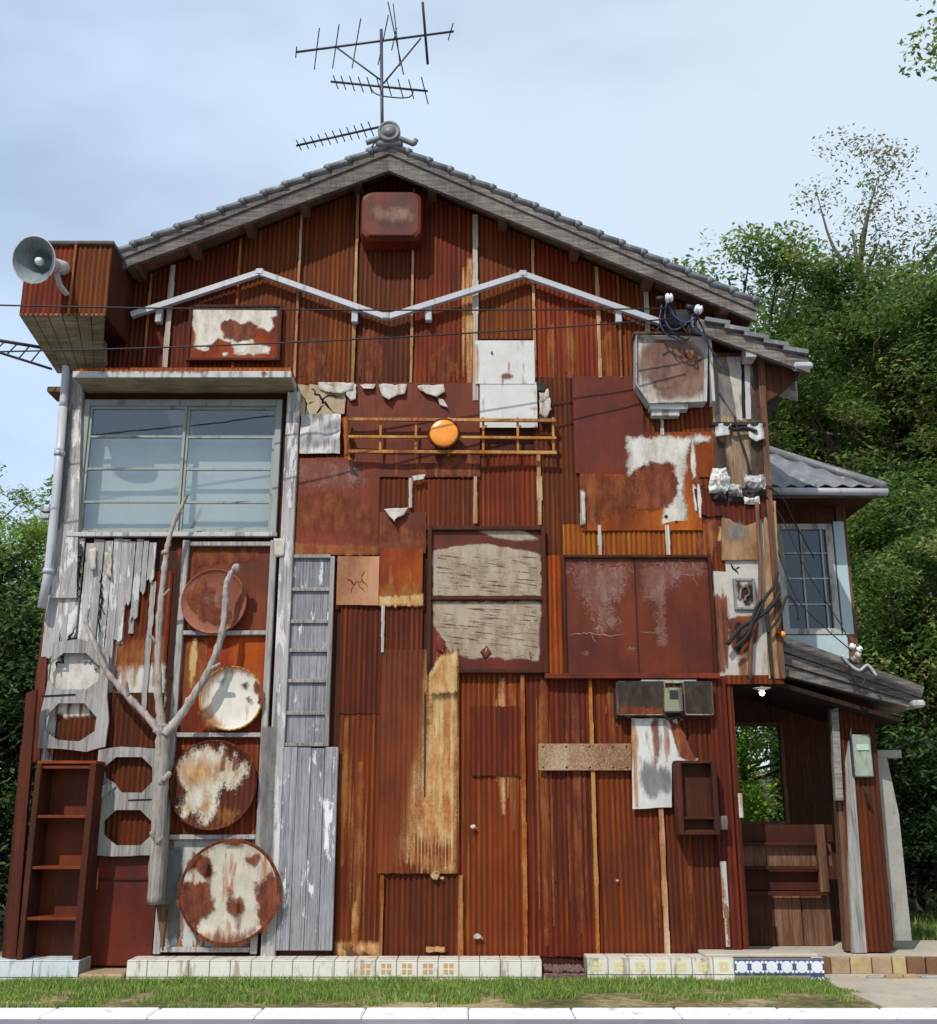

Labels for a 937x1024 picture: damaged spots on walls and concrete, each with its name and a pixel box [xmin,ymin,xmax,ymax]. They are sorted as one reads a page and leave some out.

peeling [192,308,277,356]
crack [302,388,340,414]
peeling [318,382,448,407]
peeling [626,352,786,684]
peeling [77,544,112,578]
corrosion [178,547,259,627]
crack [346,571,368,592]
peeling [429,531,542,694]
corrosion [406,681,459,874]
corrosion [651,719,696,763]
corrosion [567,771,588,934]
corrosion [176,853,284,948]